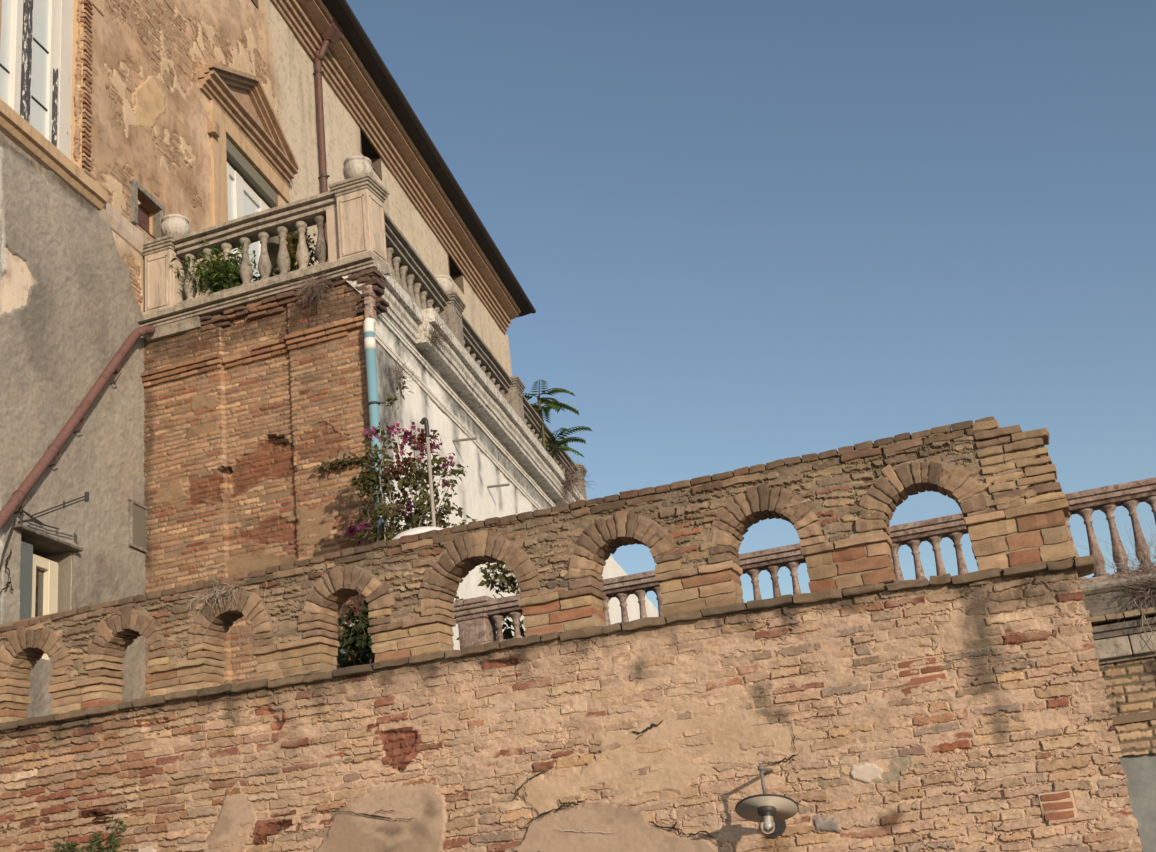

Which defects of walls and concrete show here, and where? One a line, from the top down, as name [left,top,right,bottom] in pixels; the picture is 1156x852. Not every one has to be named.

peeling [74,0,162,222]
peeling [104,0,279,138]
peeling [152,125,202,208]
crack [337,810,413,820]
crack [513,767,614,852]